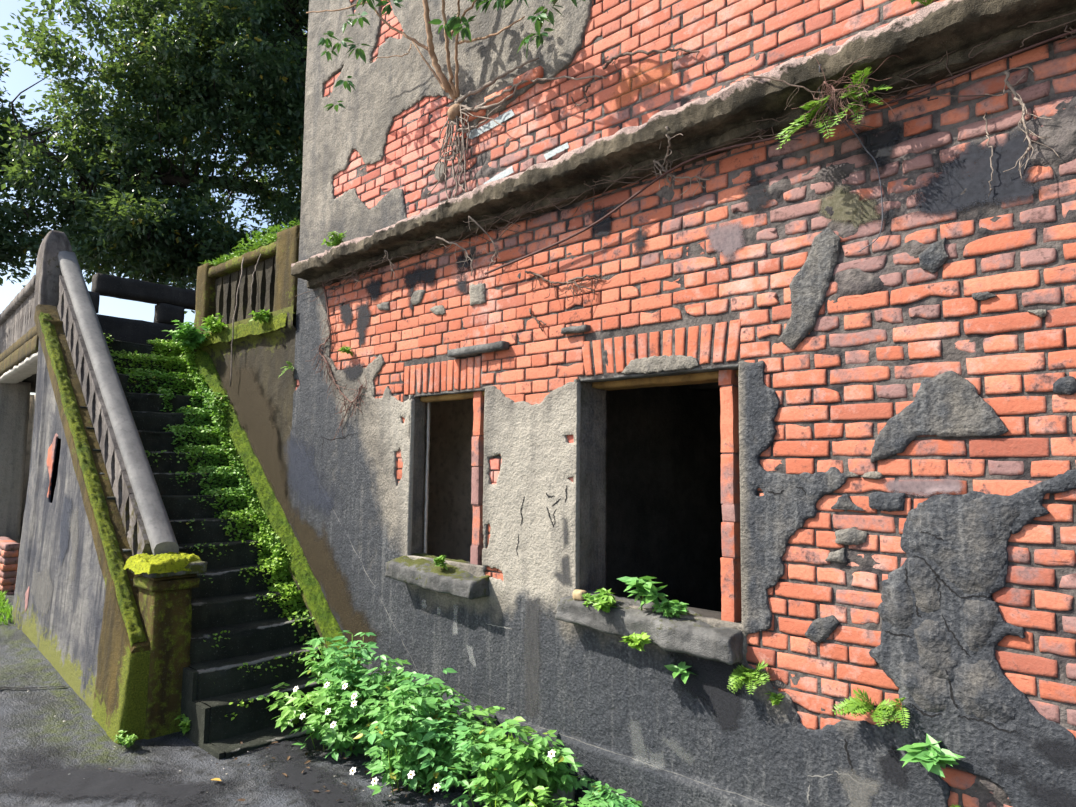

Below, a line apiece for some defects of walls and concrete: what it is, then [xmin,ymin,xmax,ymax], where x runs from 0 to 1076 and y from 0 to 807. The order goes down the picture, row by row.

spalling [333,0,944,218]
damp [913,128,1043,215]
mould [340,278,382,345]
mould [404,266,437,310]
spalling [324,38,1076,738]
crack [516,485,567,555]
damp [555,519,571,585]
crack [885,531,1017,733]
damp [670,652,746,732]
peeling [841,774,876,807]
damp [879,746,909,788]
spalling [940,766,1012,807]